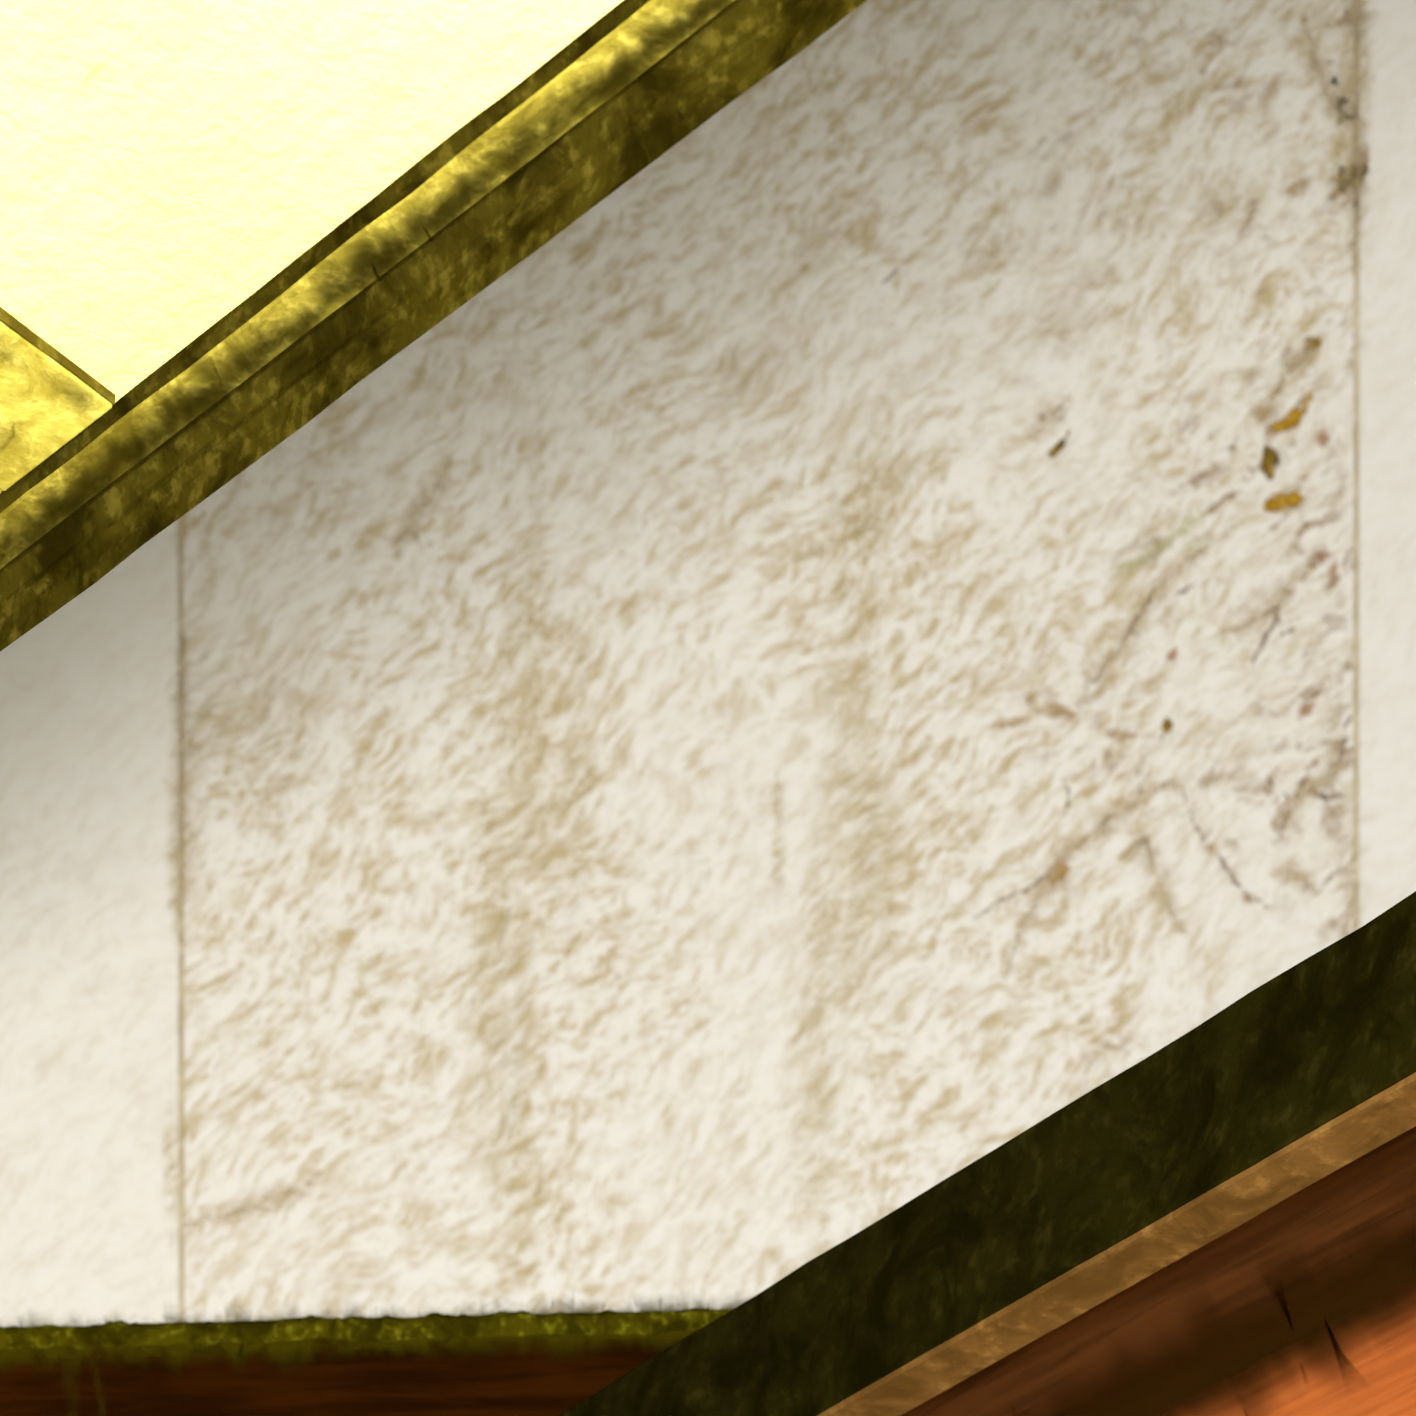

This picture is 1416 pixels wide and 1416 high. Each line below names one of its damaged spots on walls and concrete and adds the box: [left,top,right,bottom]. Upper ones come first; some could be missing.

corrosion [1257,393,1312,433]
corrosion [1264,491,1304,512]